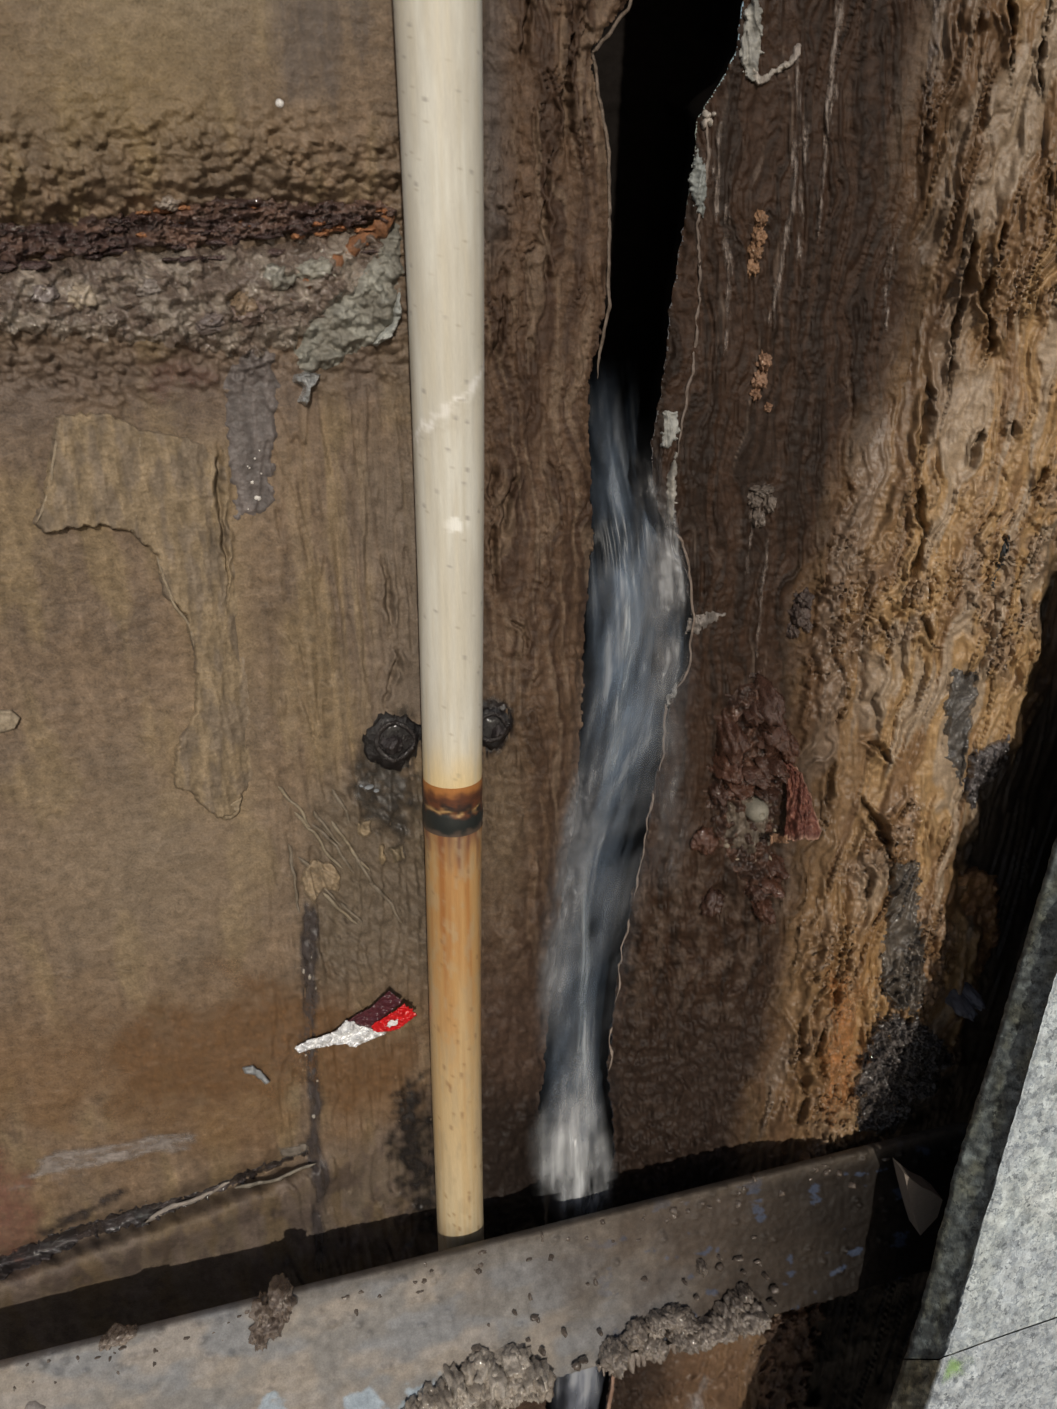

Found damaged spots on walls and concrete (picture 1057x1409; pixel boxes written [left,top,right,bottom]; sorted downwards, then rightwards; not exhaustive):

crack [534,0,801,1224]
water stain [600,0,939,1211]
crack [949,1318,1056,1356]
crack [545,1368,615,1409]
water stain [605,1349,677,1409]